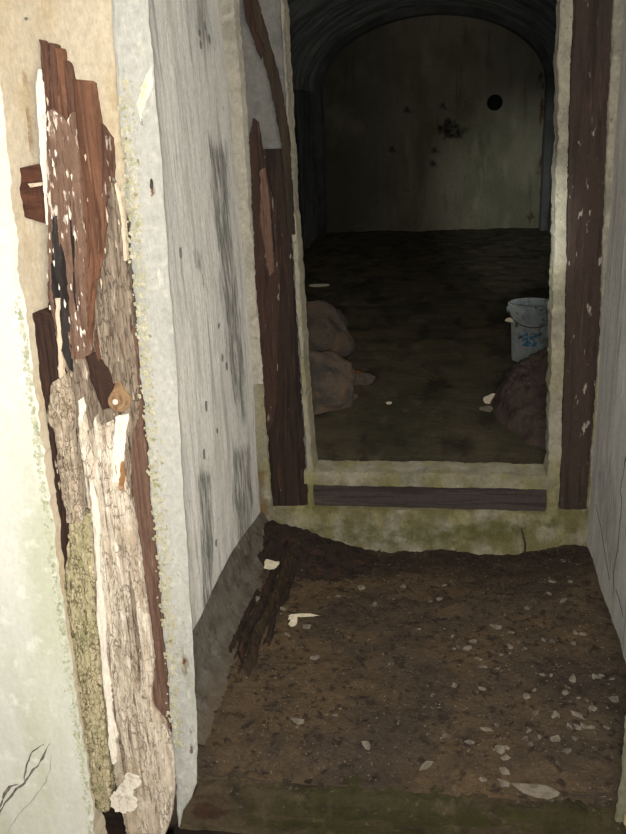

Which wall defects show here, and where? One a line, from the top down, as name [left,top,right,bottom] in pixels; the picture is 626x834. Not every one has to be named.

peeling [136,67,153,125]
peeling [13,296,142,834]
crack [0,744,51,831]